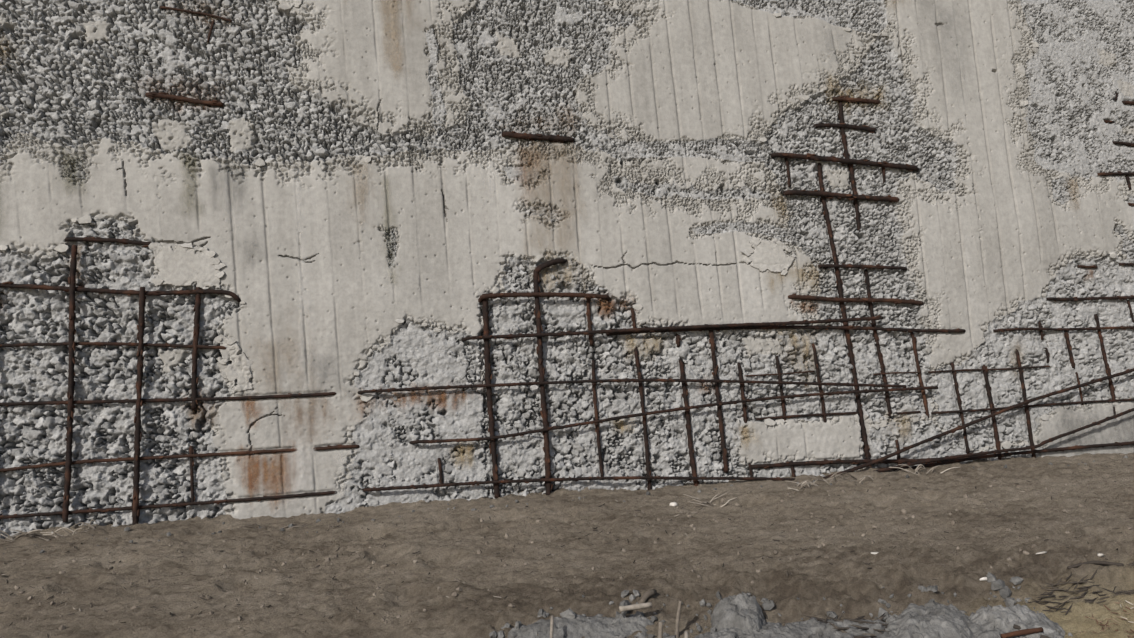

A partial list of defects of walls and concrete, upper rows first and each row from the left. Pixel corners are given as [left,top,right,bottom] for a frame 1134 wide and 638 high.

peeling [277,0,302,11]
spalling [0,16,156,133]
peeling [222,149,265,167]
spalling [167,70,412,163]
spalling [425,0,623,153]
spalling [772,0,902,138]
spalling [1020,0,1134,205]
crack [592,252,751,269]
peeling [741,200,893,278]
spalling [0,215,254,539]